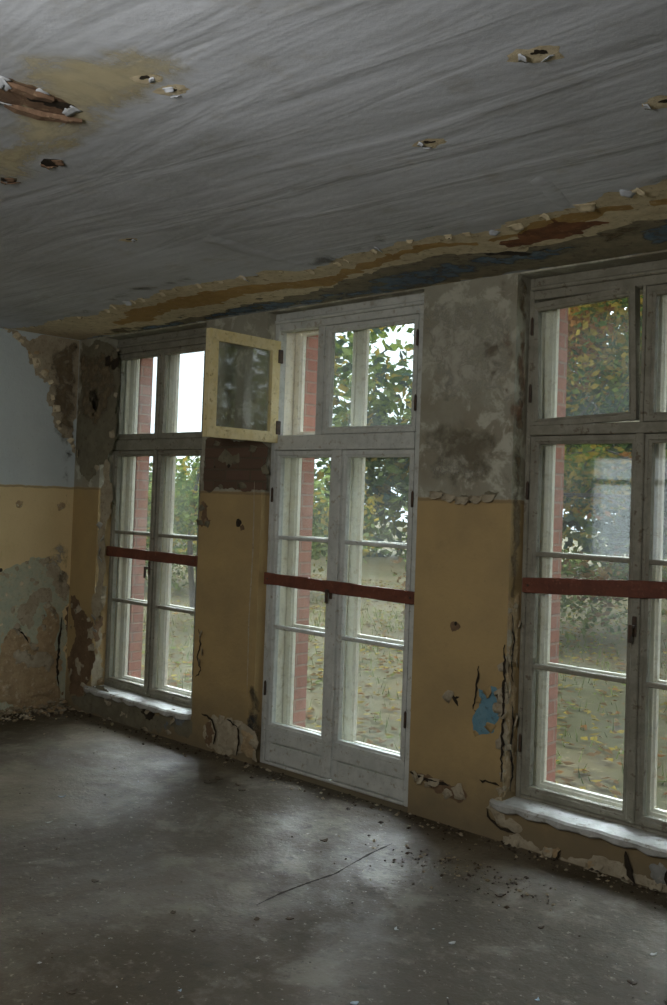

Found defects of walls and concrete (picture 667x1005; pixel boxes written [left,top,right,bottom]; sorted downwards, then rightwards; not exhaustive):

damp [0,53,174,176]
peeling [3,179,667,482]
damp [429,305,525,429]
flaking render [196,437,269,528]
peeling [0,557,259,762]
flaking render [410,770,467,803]